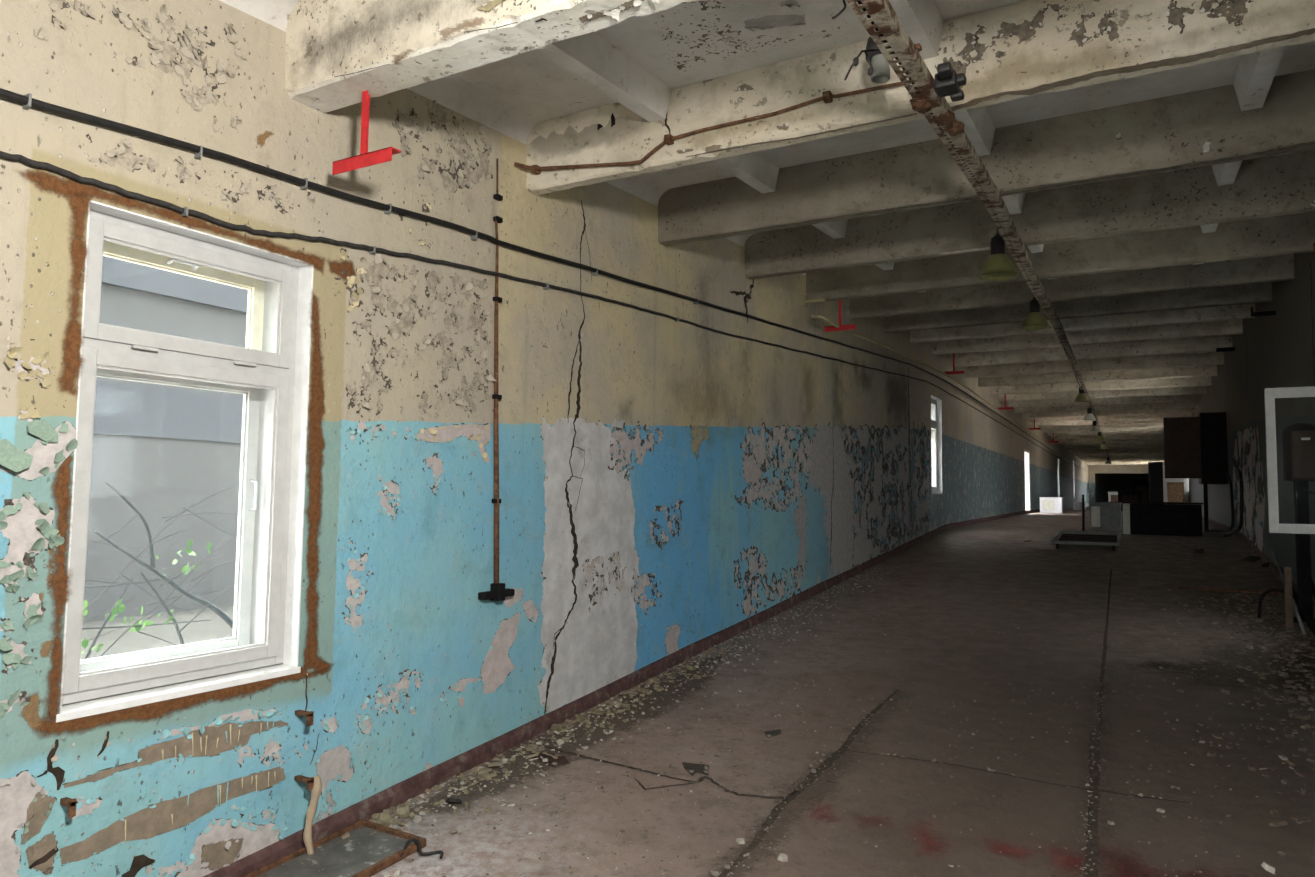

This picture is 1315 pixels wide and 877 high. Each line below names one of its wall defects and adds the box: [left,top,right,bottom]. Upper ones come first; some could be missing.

peeling [477,0,503,11]
spalling [579,0,659,24]
spalling [677,113,917,157]
spalling [951,28,1315,111]
peeling [335,248,496,495]
peeling [0,339,78,674]
flaking render [440,416,683,713]
peeling [734,421,932,617]
crack [535,200,1195,877]
peeling [0,689,31,718]
peeling [356,669,423,734]
flaking render [0,708,354,877]